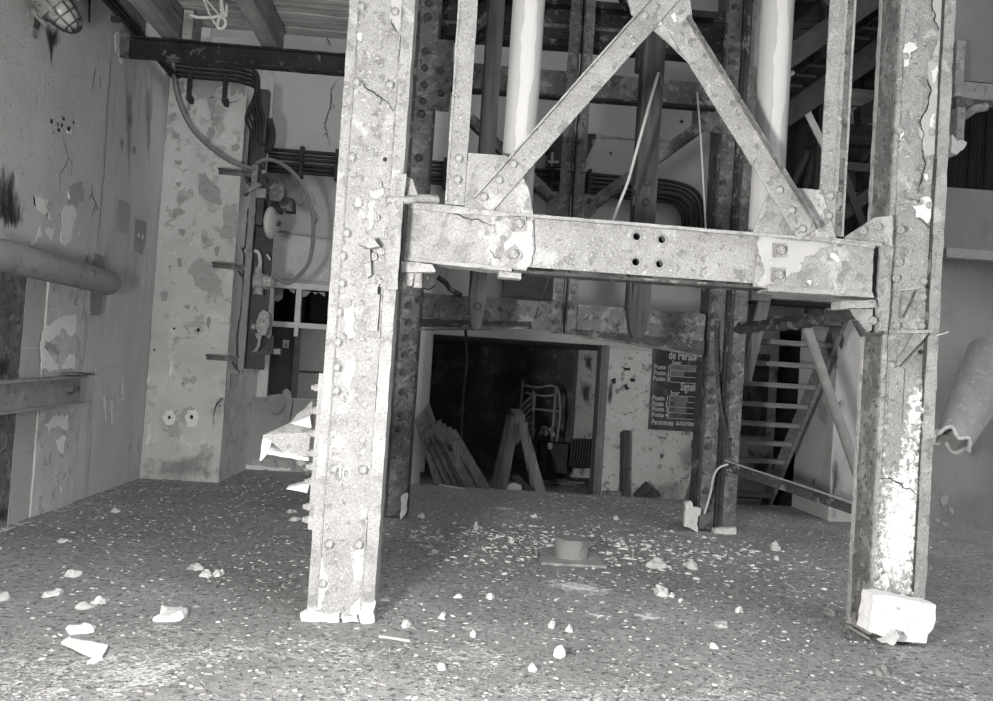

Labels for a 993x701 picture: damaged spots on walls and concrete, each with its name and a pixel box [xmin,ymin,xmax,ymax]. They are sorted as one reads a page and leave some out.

peeling [903,42,918,67]
peeling [918,0,942,156]
peeling [169,74,246,141]
crack [323,81,337,142]
peeling [168,173,238,293]
peeling [354,188,384,230]
peeling [757,236,840,286]
peeling [40,314,77,372]
peeling [45,415,68,454]